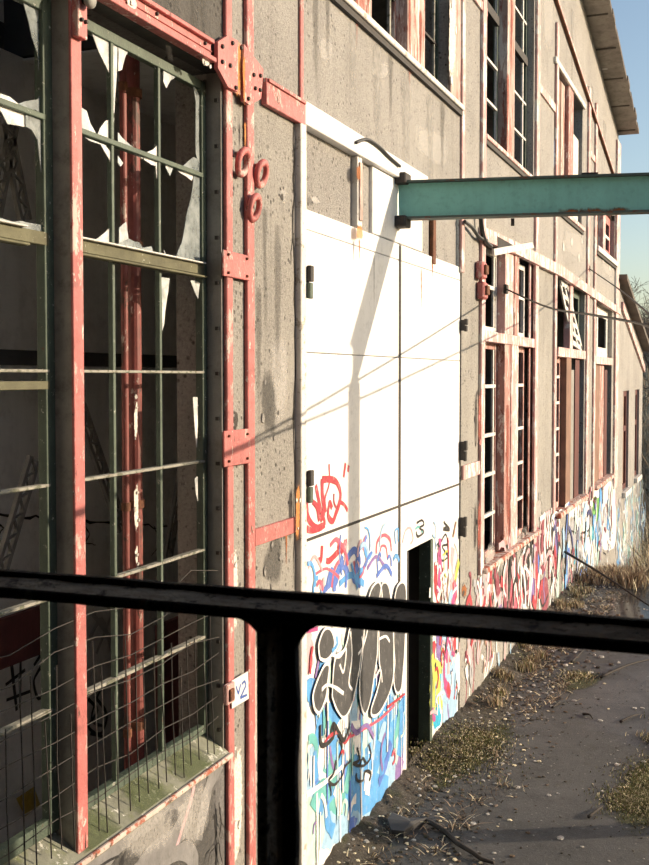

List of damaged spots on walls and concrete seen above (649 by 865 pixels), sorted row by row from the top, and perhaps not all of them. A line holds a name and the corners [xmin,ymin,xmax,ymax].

peeling [449,0,457,84]
peeling [478,505,487,564]